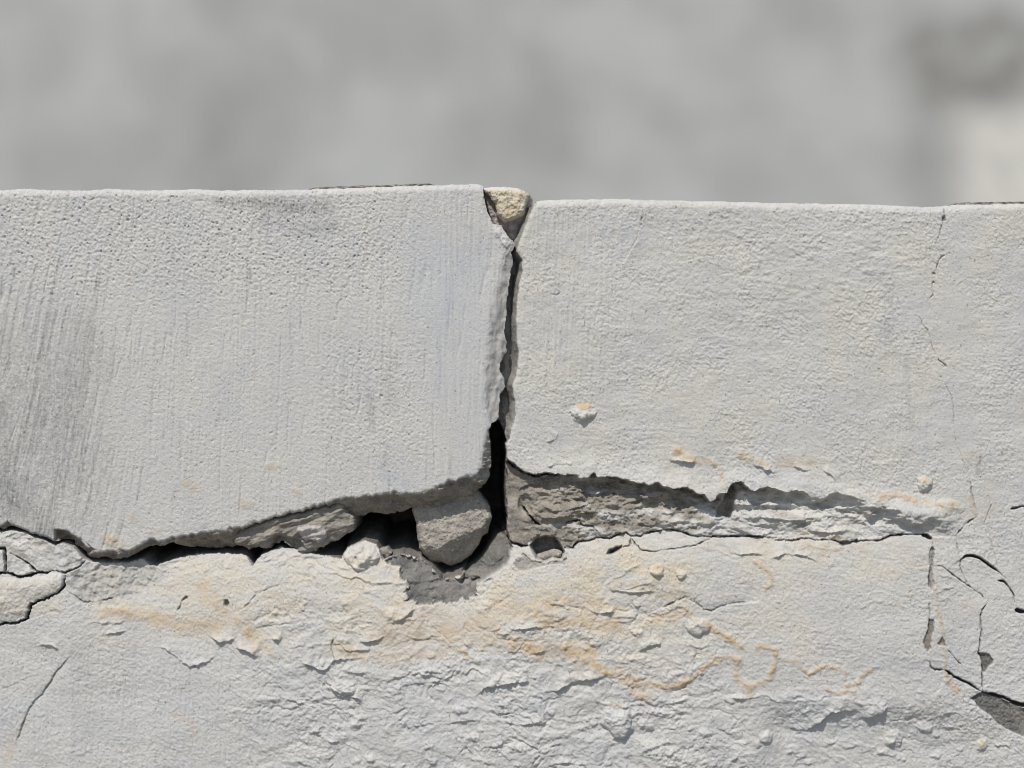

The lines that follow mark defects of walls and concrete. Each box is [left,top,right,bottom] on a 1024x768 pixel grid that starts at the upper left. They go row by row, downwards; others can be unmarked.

crack [479,206,1024,708]
crack [0,507,467,626]
spalling [386,461,940,606]
crack [0,661,66,737]
crack [331,633,339,663]
peeling [923,619,947,653]